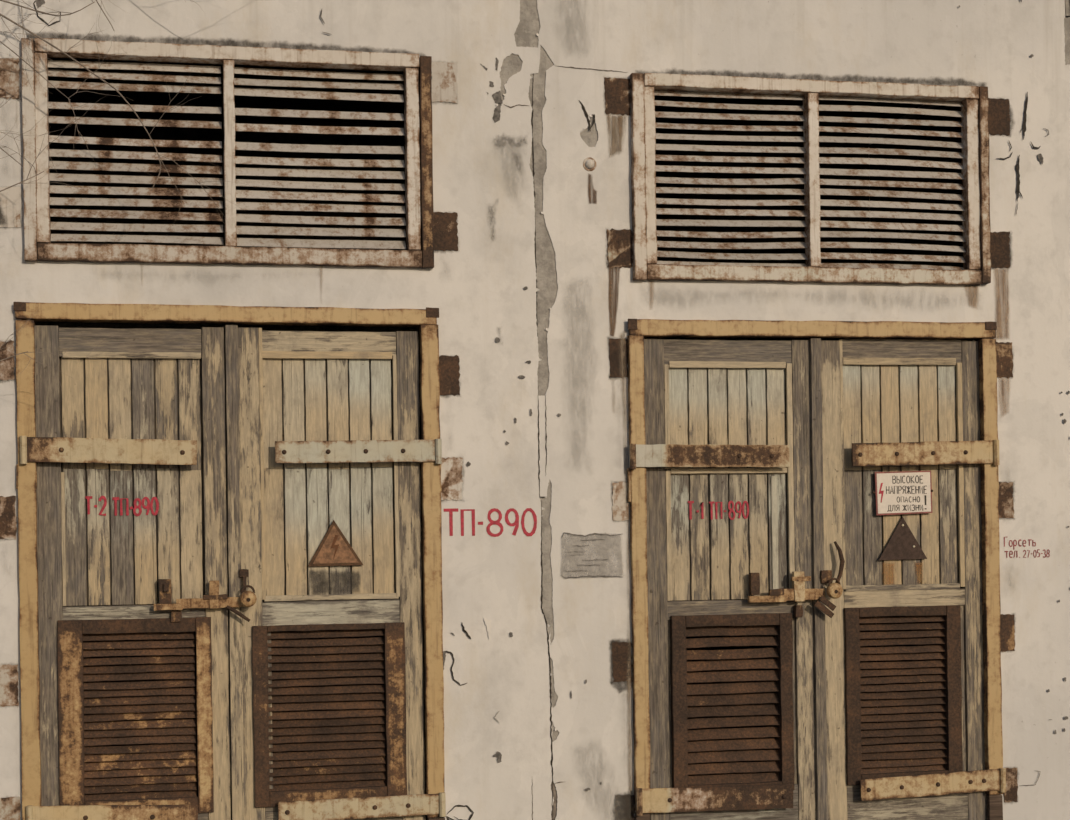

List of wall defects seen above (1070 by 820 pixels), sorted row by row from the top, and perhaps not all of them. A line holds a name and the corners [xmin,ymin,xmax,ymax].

peeling [481,54,528,123]
crack [579,101,595,131]
crack [559,65,628,73]
crack [996,92,1028,214]
crack [530,74,538,337]